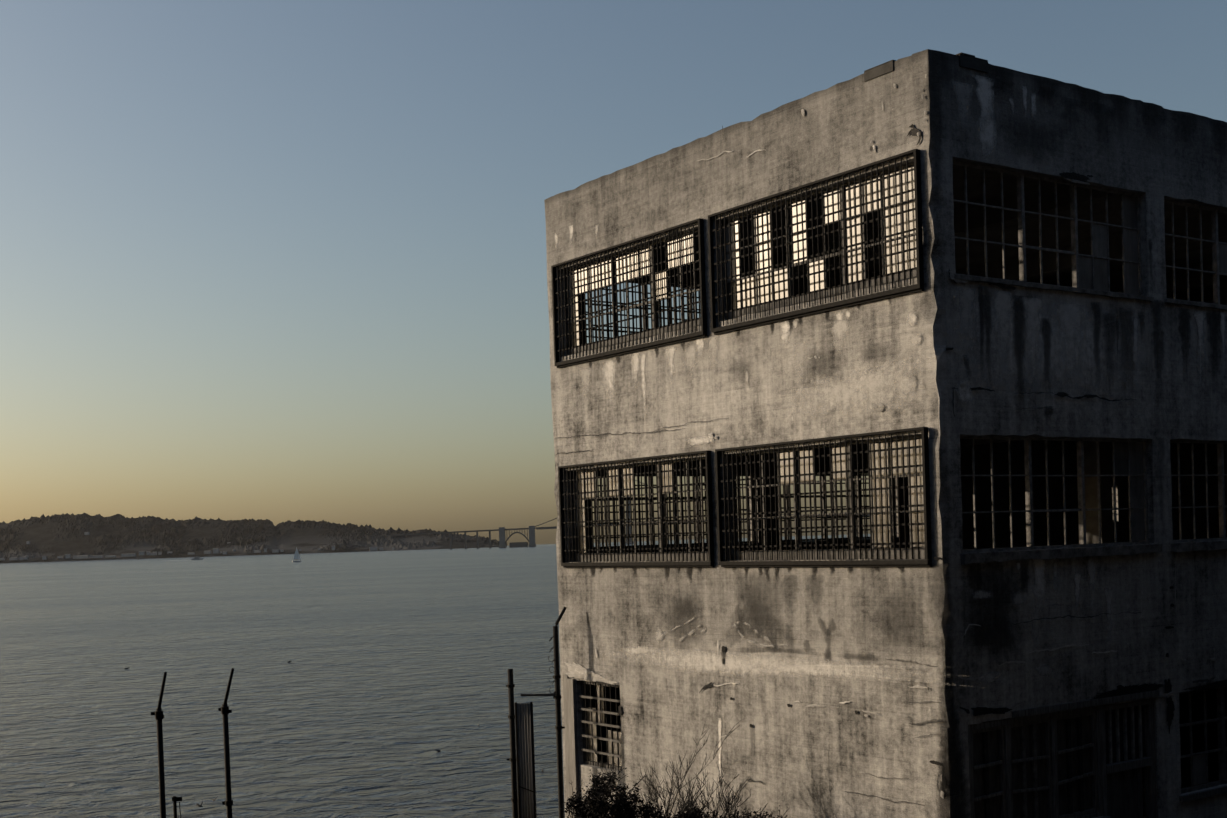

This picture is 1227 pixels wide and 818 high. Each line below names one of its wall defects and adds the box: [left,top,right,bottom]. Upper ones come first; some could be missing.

leakage [928,55,1009,169]
leakage [1080,89,1100,104]
leakage [1143,105,1158,123]
leakage [959,284,1163,425]
leakage [1179,308,1225,377]
leakage [626,546,1117,818]